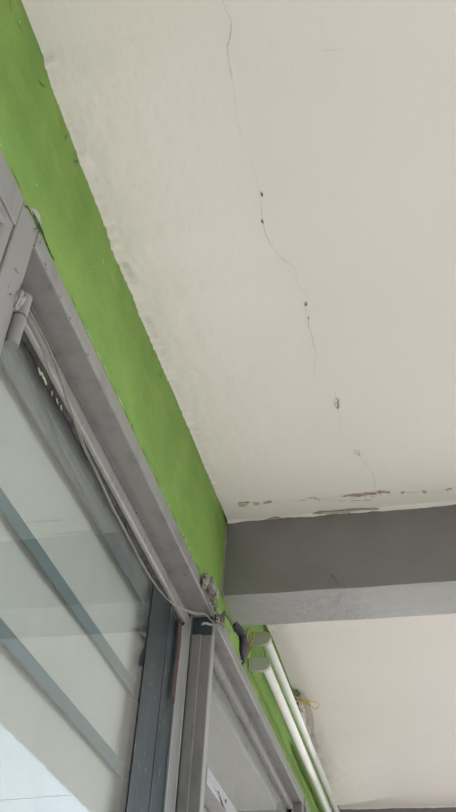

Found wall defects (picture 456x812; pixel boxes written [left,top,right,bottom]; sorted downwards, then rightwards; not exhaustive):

peeling [314,491,390,515]